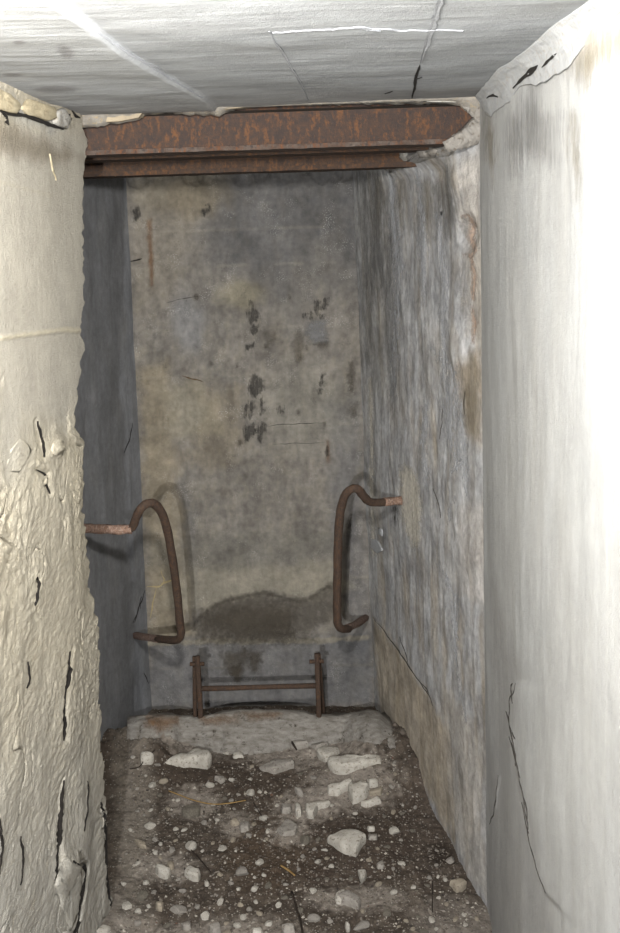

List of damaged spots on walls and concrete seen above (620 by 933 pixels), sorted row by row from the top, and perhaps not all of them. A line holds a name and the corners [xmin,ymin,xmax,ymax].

leakage [245,301,258,350]
leakage [244,374,266,443]
flaking render [8,439,32,472]
crack [489,683,545,892]